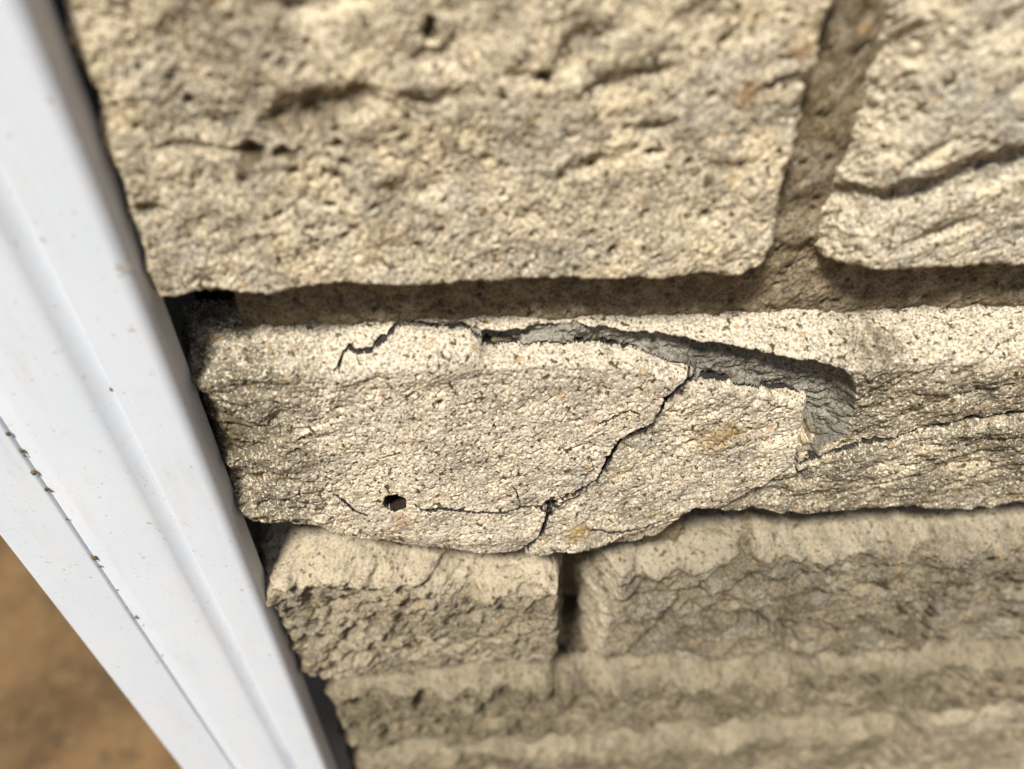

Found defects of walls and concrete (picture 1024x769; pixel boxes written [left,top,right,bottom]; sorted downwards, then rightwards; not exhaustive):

crack [333,494,368,517]
crack [333,320,480,371]
crack [415,361,693,552]
spalling [318,320,856,556]